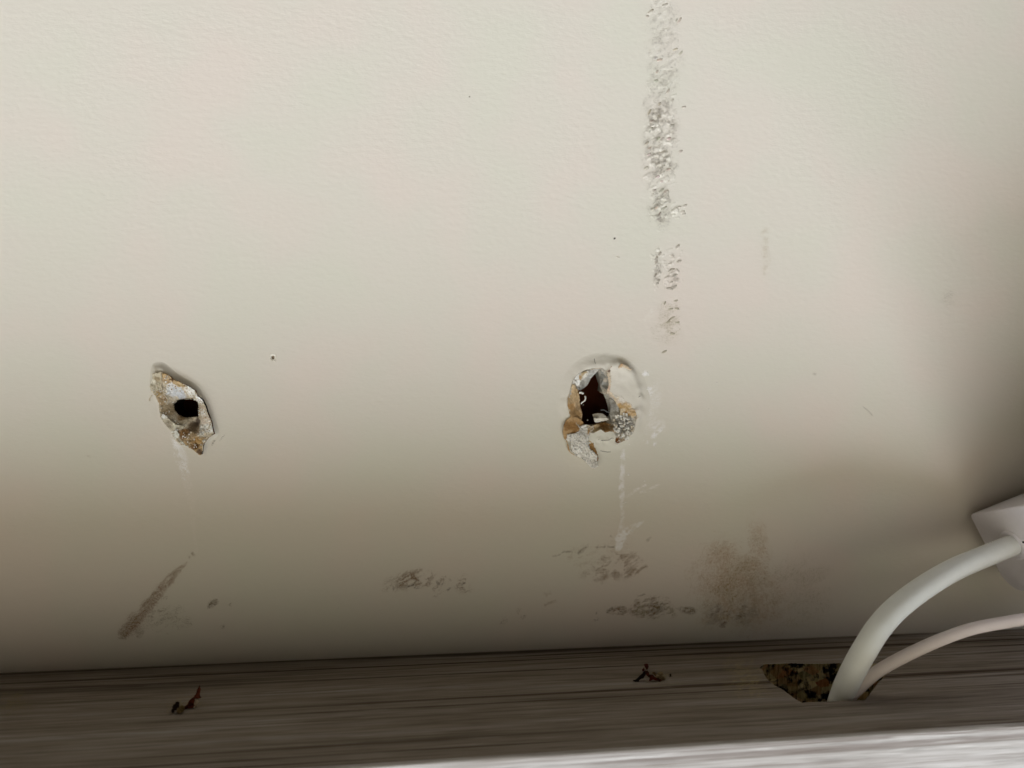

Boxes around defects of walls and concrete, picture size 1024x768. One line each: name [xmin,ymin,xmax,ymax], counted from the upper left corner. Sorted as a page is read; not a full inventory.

peeling [641,0,687,234]
peeling [649,245,685,292]
spalling [592,413,609,422]